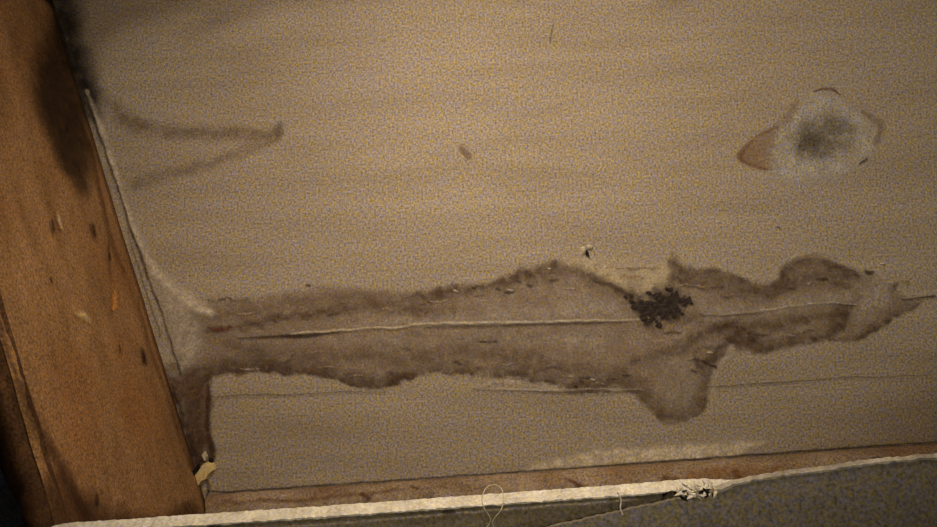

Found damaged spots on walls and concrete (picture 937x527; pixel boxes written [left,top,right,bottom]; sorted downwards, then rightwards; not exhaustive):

leakage [494,270,533,293]
leakage [588,262,703,333]
leakage [689,321,795,372]
leakage [167,361,416,468]